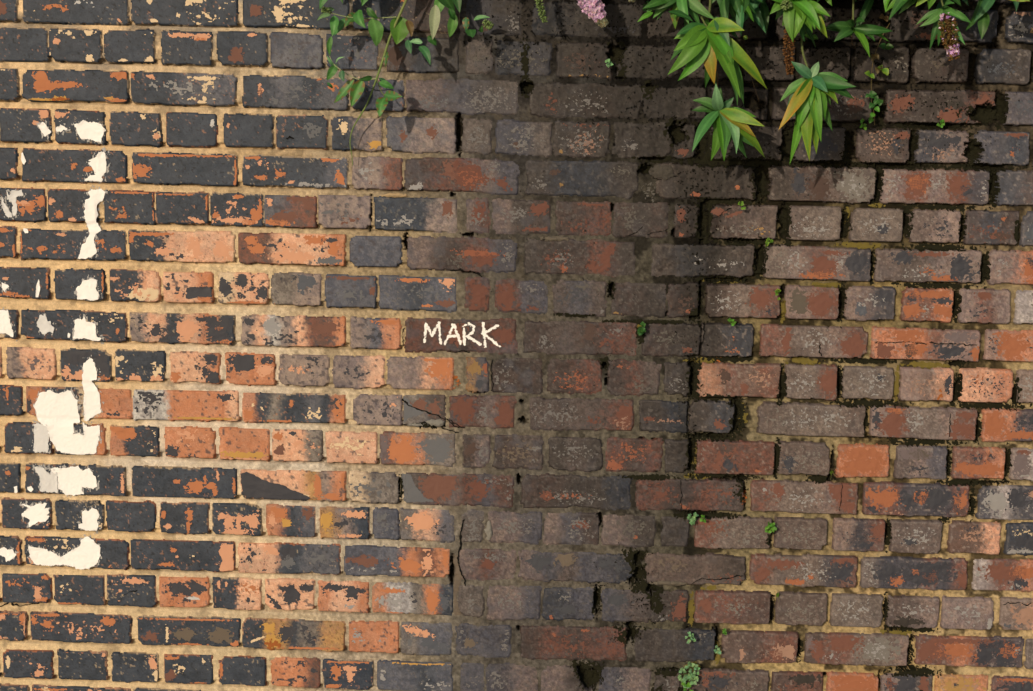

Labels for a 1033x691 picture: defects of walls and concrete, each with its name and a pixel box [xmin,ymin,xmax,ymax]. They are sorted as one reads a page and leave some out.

peeling [321,158,345,185]
peeling [16,195,76,221]
peeling [0,228,66,258]
peeling [0,277,30,298]
peeling [97,371,183,382]
peeling [27,388,39,401]
peeling [244,409,320,455]
peeling [184,507,193,534]
crack [457,519,466,586]
peeling [0,575,239,640]
peeling [146,642,209,670]
spalling [26,661,67,691]